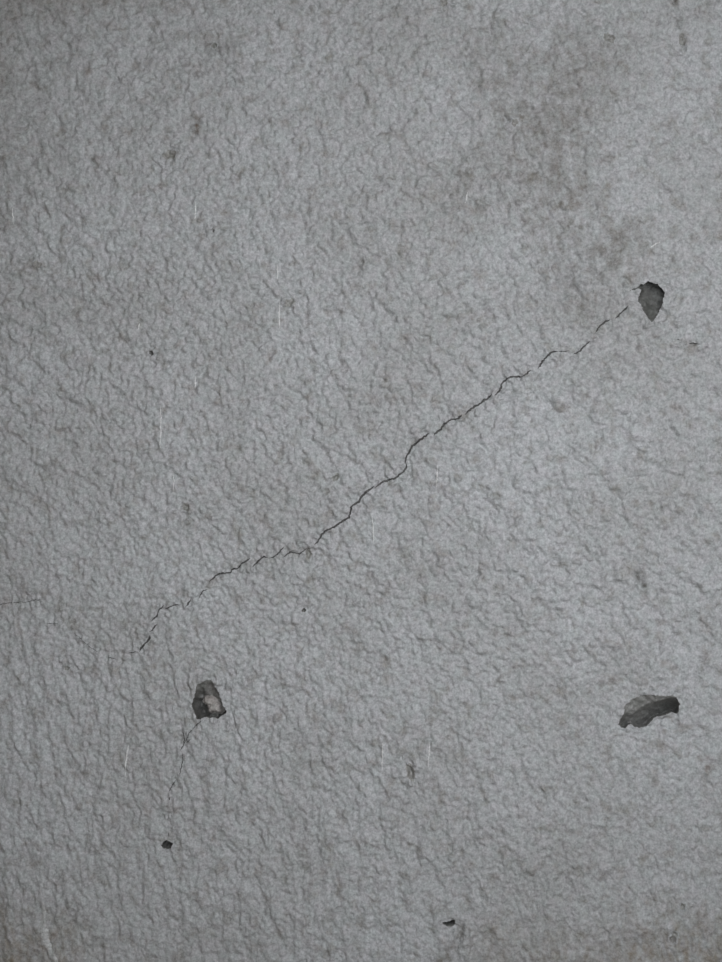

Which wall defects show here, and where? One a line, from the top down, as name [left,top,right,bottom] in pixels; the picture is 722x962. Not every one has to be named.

spalling [630,281,665,322]
crack [48,306,628,659]
spalling [192,680,227,719]
spalling [618,694,680,728]